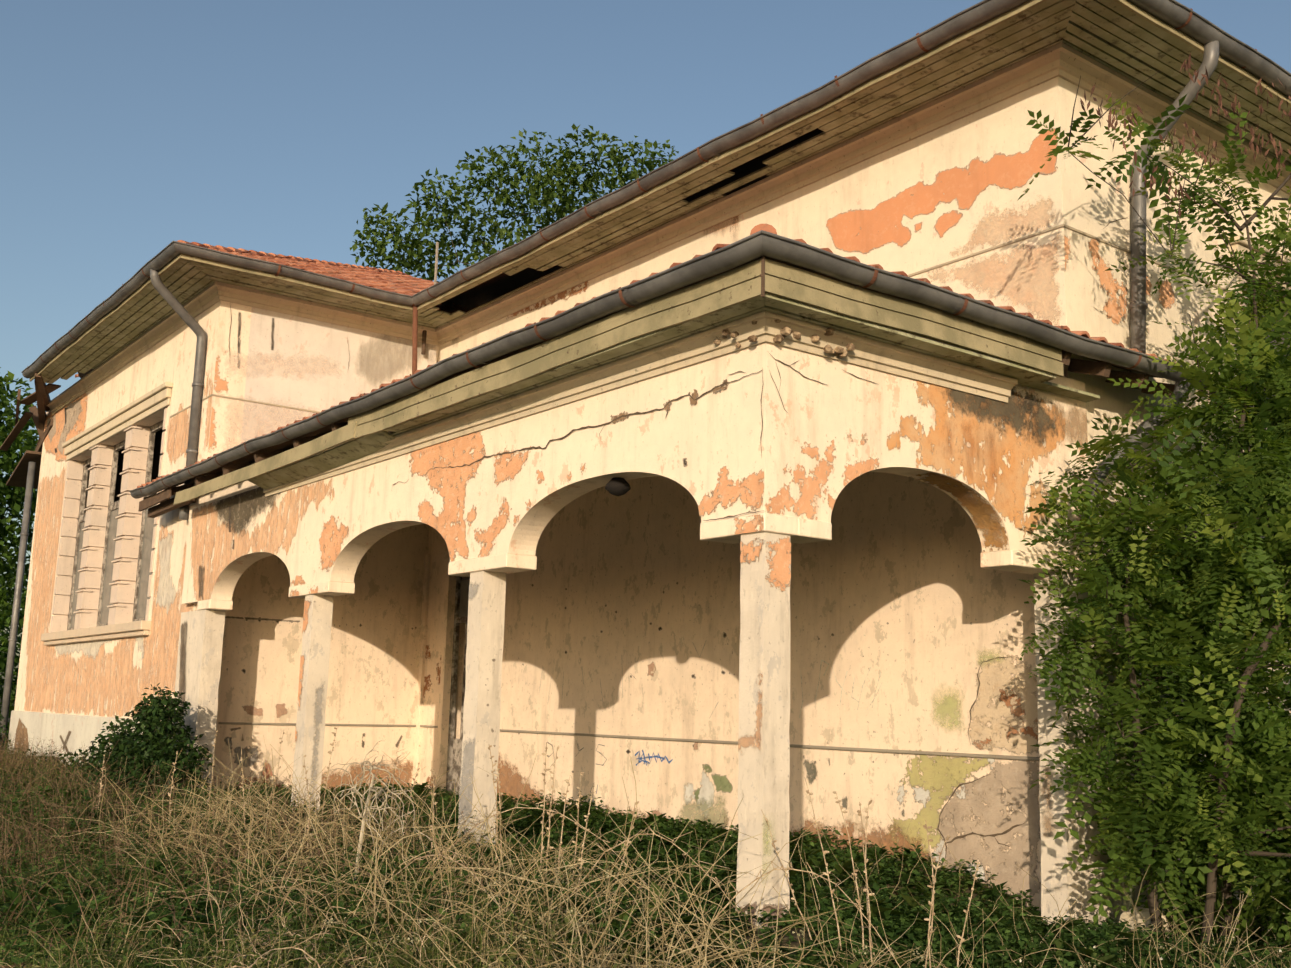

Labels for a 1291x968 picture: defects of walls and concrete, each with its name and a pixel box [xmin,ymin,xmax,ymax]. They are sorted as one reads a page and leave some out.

peeling [826,128,1058,254]
peeling [928,199,1071,325]
peeling [1088,238,1127,325]
peeling [1146,275,1177,309]
crack [393,353,877,485]
leakage [949,387,1088,450]
peeling [409,431,544,561]
peeling [698,380,1066,592]
peeling [14,393,349,755]
spalling [803,755,830,783]
spalling [882,655,1041,907]